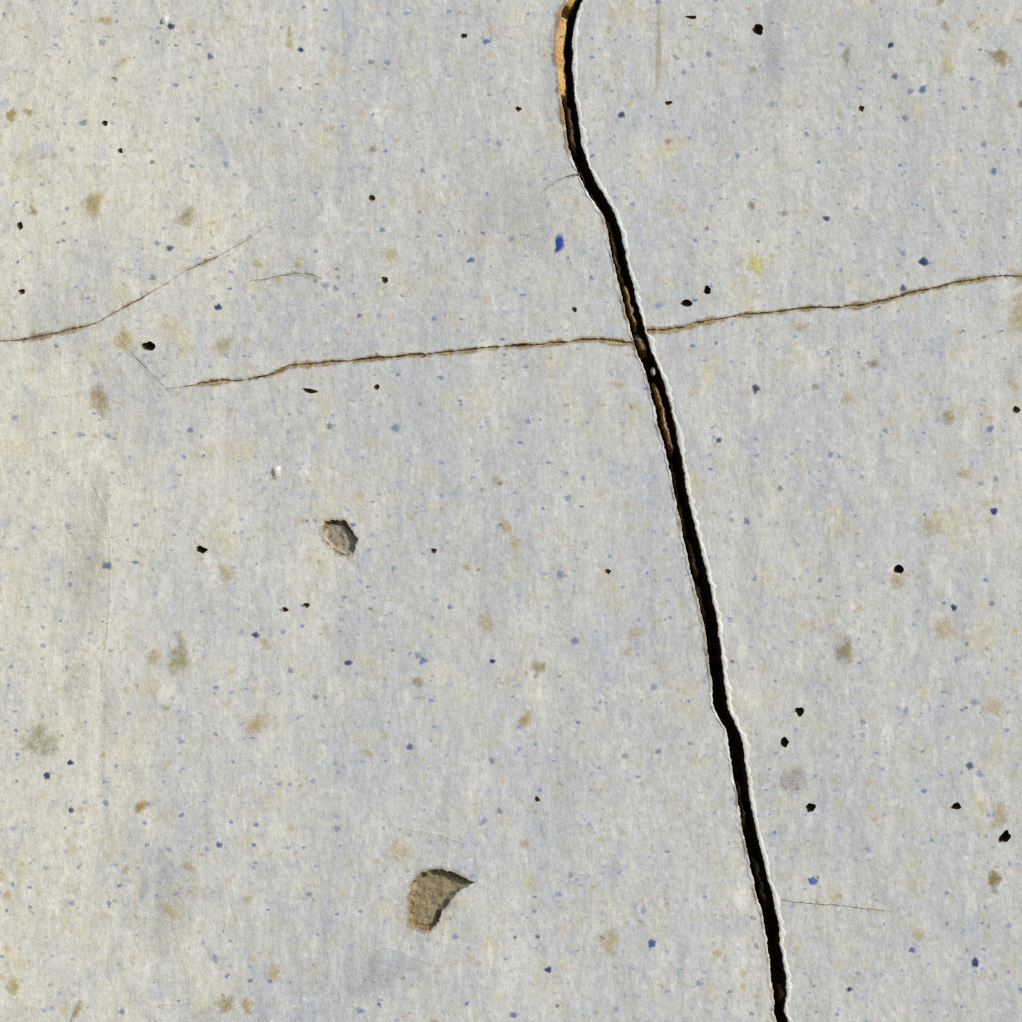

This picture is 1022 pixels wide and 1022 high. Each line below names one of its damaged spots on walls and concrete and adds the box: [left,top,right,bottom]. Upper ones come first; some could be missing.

crack [0,223,269,342]
crack [647,275,1022,334]
hole [323,520,358,557]
crack [178,0,839,1022]
spalling [408,869,475,931]